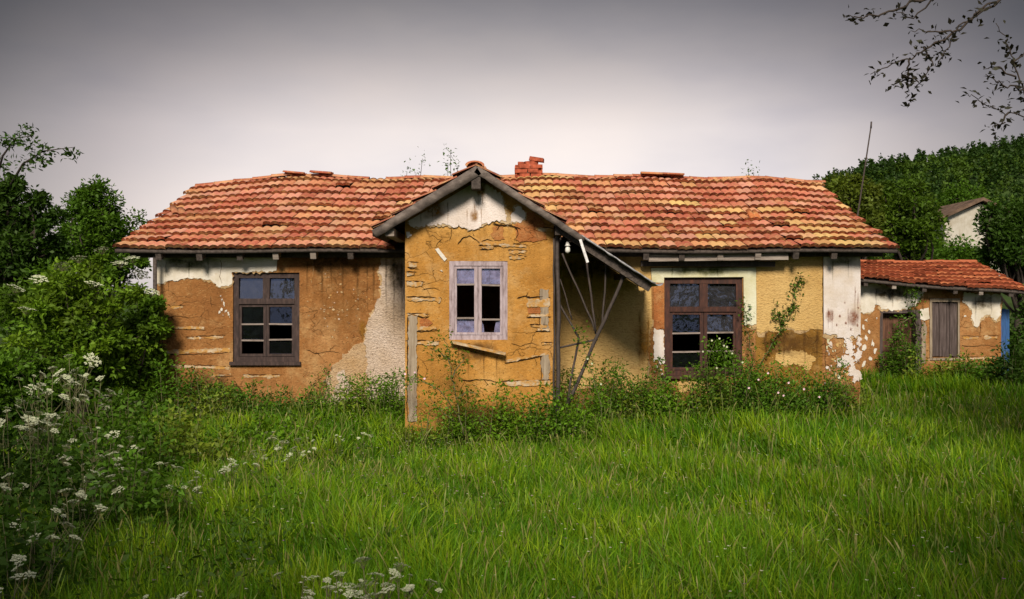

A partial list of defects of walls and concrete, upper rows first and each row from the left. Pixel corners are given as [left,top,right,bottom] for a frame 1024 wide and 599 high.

peeling [406,182,546,242]
crack [436,223,520,246]
spalling [157,258,381,412]
peeling [644,257,1003,406]